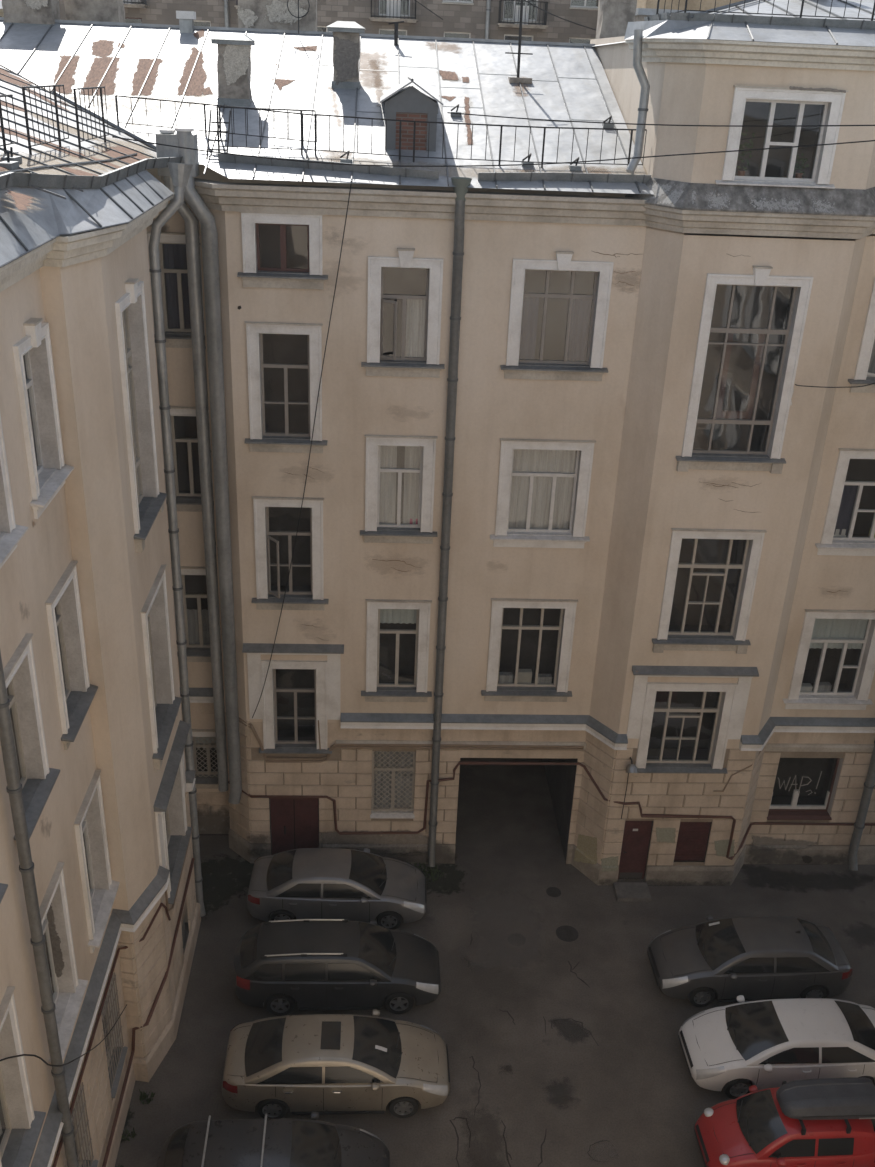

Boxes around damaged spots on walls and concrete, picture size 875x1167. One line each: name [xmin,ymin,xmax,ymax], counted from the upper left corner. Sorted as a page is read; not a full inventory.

rust [0,39,125,111]
rust [131,58,163,95]
rust [178,29,213,96]
spalling [222,44,252,86]
rust [439,70,469,82]
rust [441,96,473,145]
crack [450,1056,547,1167]